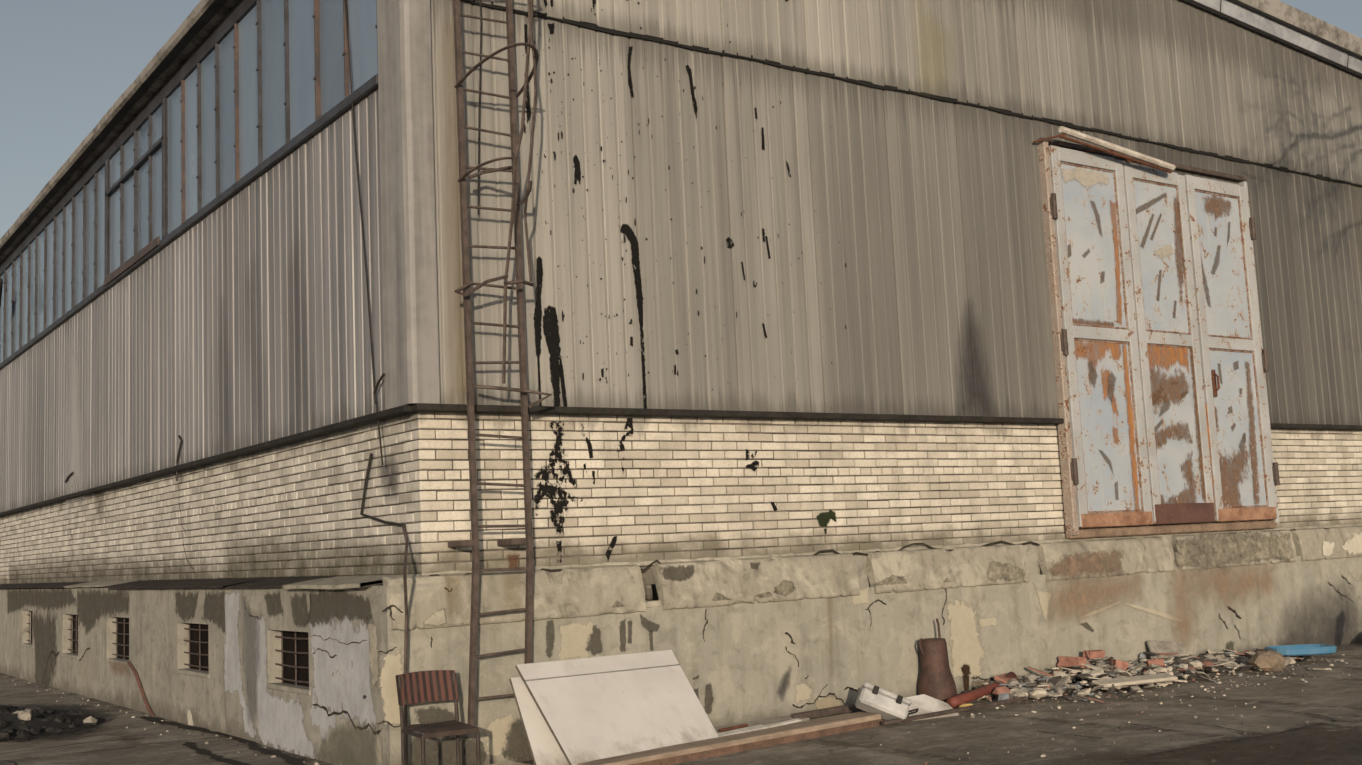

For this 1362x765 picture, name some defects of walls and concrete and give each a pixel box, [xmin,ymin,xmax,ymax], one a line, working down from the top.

corrosion [1205,195,1231,220]
corrosion [1174,198,1185,300]
corrosion [1073,200,1139,511]
corrosion [1148,344,1260,508]
spalling [1051,551,1121,577]
leakage [77,589,129,634]
leakage [309,589,372,627]
crack [307,595,403,658]
spalling [757,580,796,598]
peeling [852,575,907,605]
peeling [175,590,403,764]
crack [312,704,401,735]